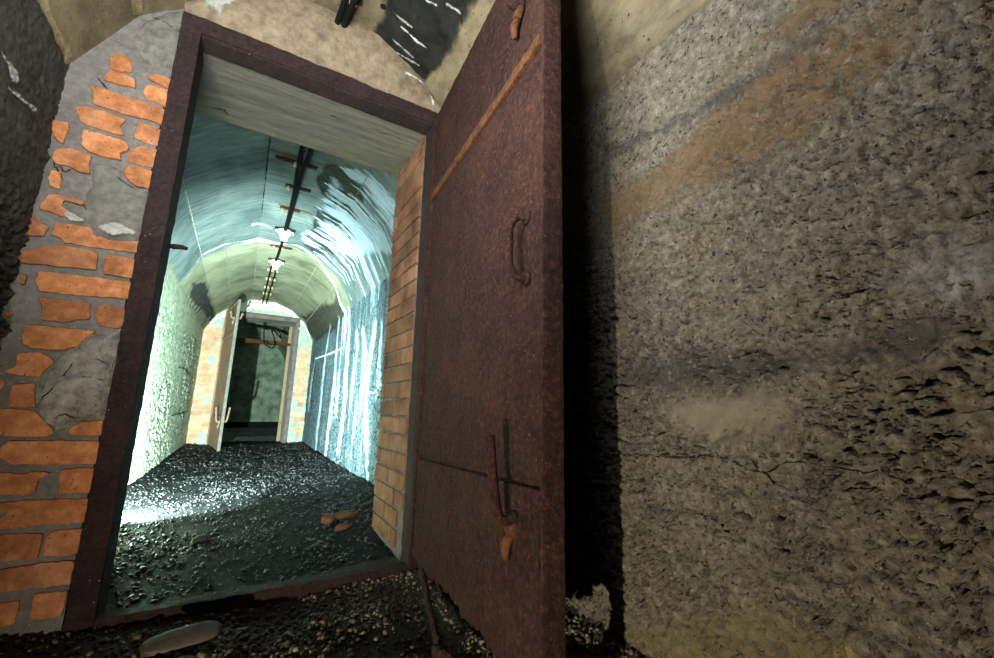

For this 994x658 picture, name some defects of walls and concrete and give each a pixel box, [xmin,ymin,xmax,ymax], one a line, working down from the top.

water stain [375,0,476,83]